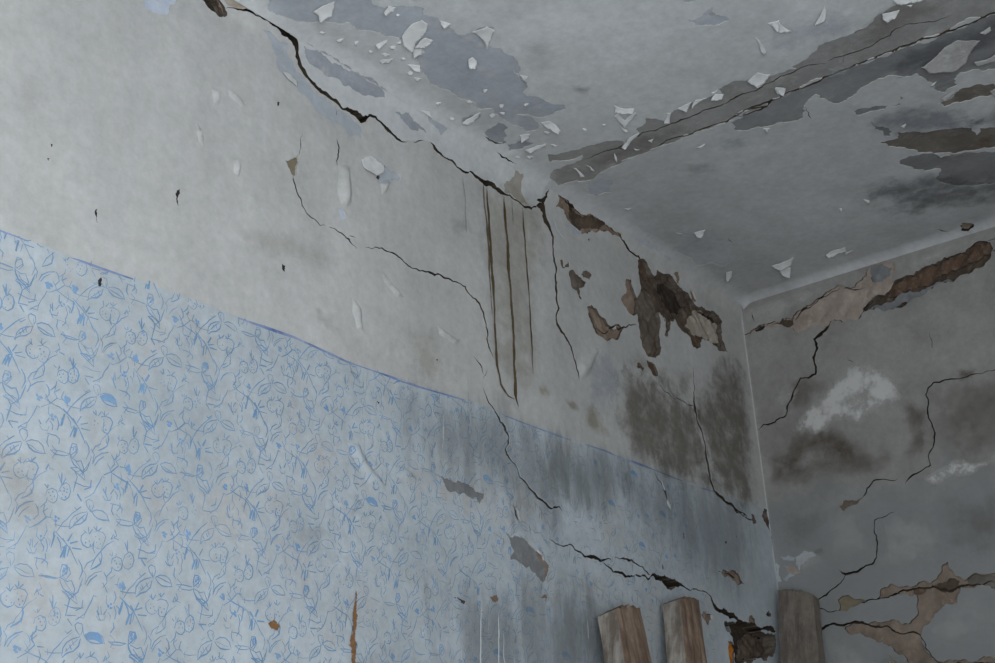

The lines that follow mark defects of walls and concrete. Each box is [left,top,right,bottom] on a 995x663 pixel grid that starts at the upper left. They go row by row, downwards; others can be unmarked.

crack [587,11,995,159]
crack [227,7,580,380]
peeling [203,0,995,376]
crack [293,178,562,510]
leakage [628,375,749,498]
crack [659,370,772,539]
crack [760,321,831,428]
leakage [790,366,898,462]
corrosion [350,592,358,663]
crack [551,540,776,634]
flaking render [724,615,776,663]
flaking render [820,562,995,663]